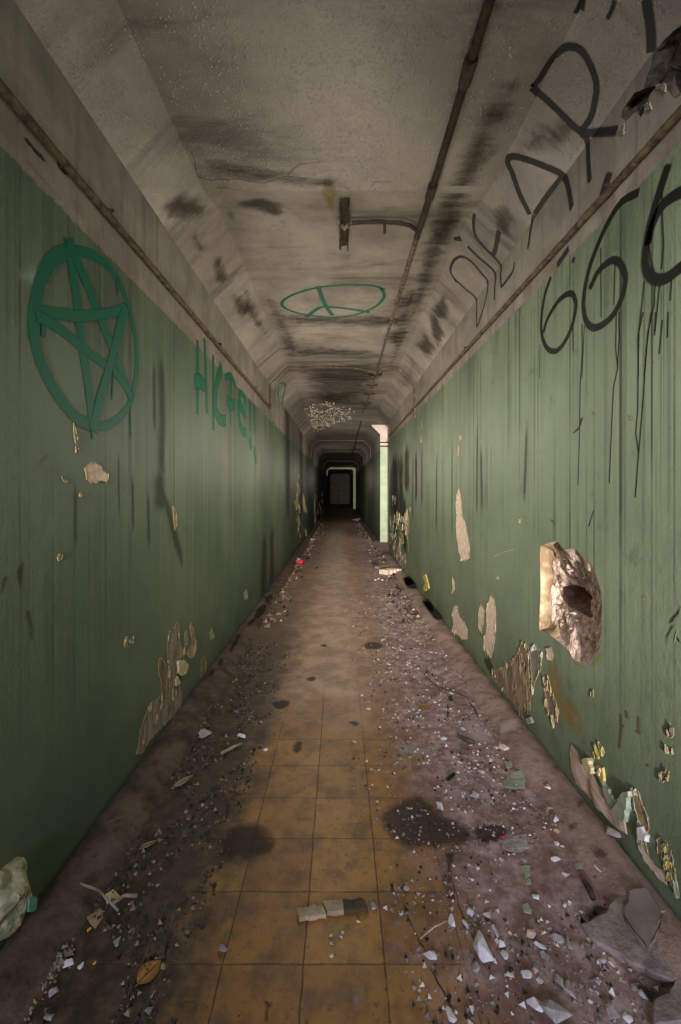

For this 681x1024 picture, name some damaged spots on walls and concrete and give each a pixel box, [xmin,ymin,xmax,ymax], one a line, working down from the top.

spalling [620,25,681,135]
spalling [79,461,109,498]
peeling [390,497,411,568]
peeling [455,488,470,562]
peeling [135,621,207,756]
spalling [451,542,602,729]
spalling [658,723,674,783]
flaking render [569,741,680,899]